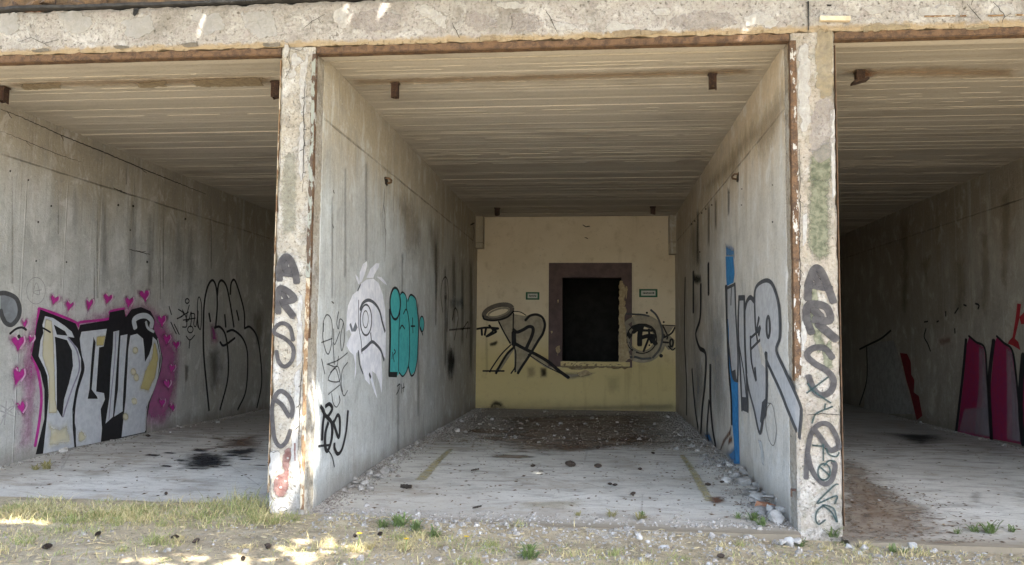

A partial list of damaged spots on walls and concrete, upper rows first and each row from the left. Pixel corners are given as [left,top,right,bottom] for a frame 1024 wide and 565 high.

peeling [263,42,308,182]
corrosion [360,70,742,84]
leakage [808,139,832,260]
peeling [269,295,303,513]